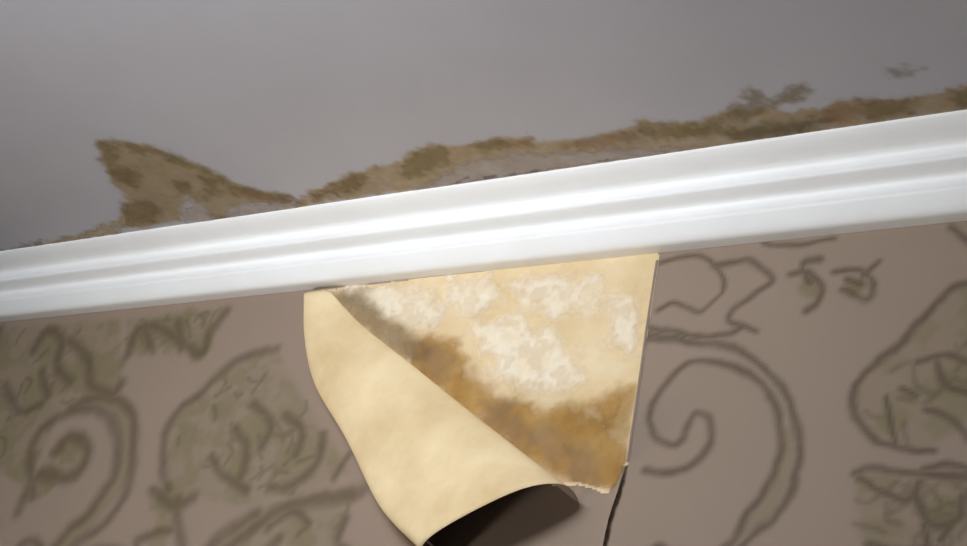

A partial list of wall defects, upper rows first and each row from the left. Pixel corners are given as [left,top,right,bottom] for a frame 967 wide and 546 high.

leakage [35,81,967,246]
flaking render [360,253,660,479]
flaking render [544,468,611,493]